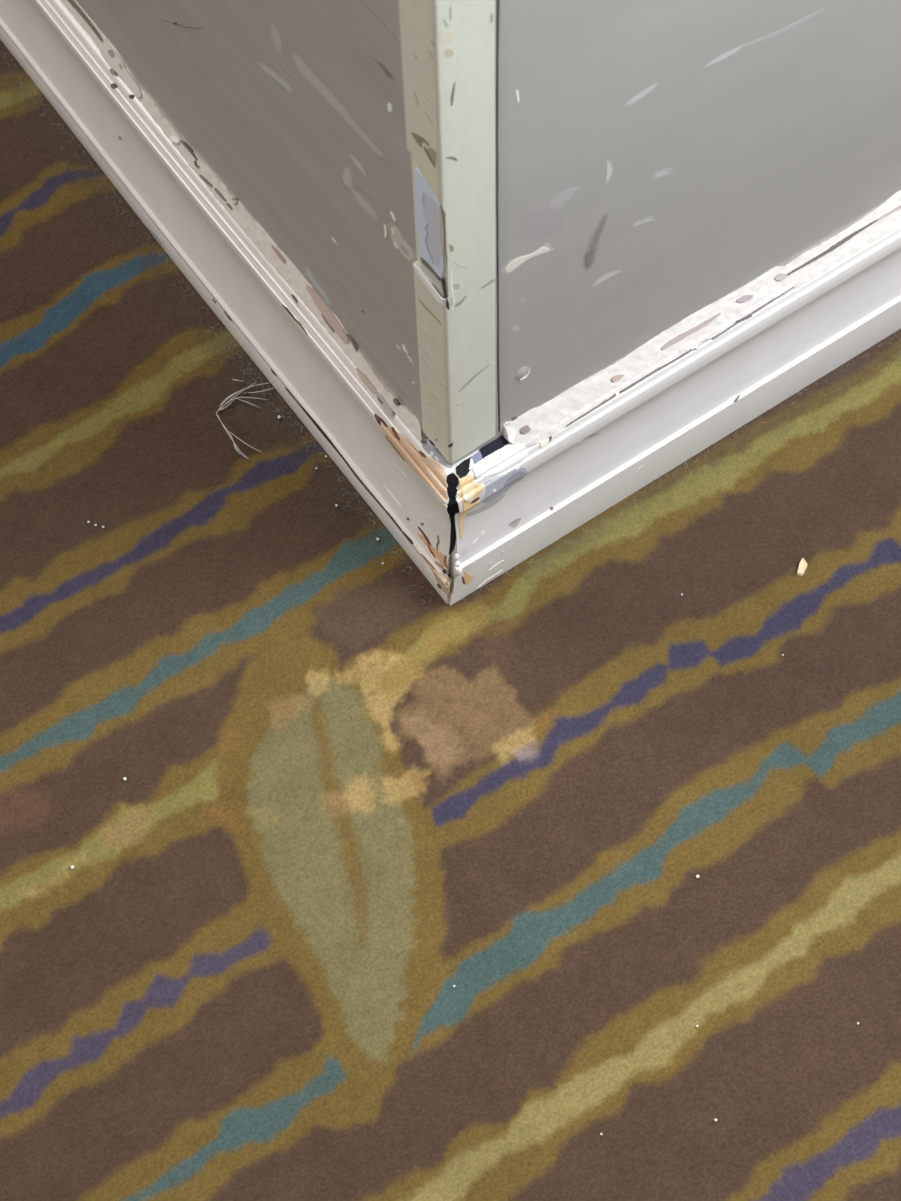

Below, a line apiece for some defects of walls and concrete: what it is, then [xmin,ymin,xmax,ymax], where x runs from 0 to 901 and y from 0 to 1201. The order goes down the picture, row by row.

peeling [99,44,143,97]
crack [271,369,459,598]
spalling [374,414,400,440]
peeling [421,439,454,508]
peeling [469,420,549,493]